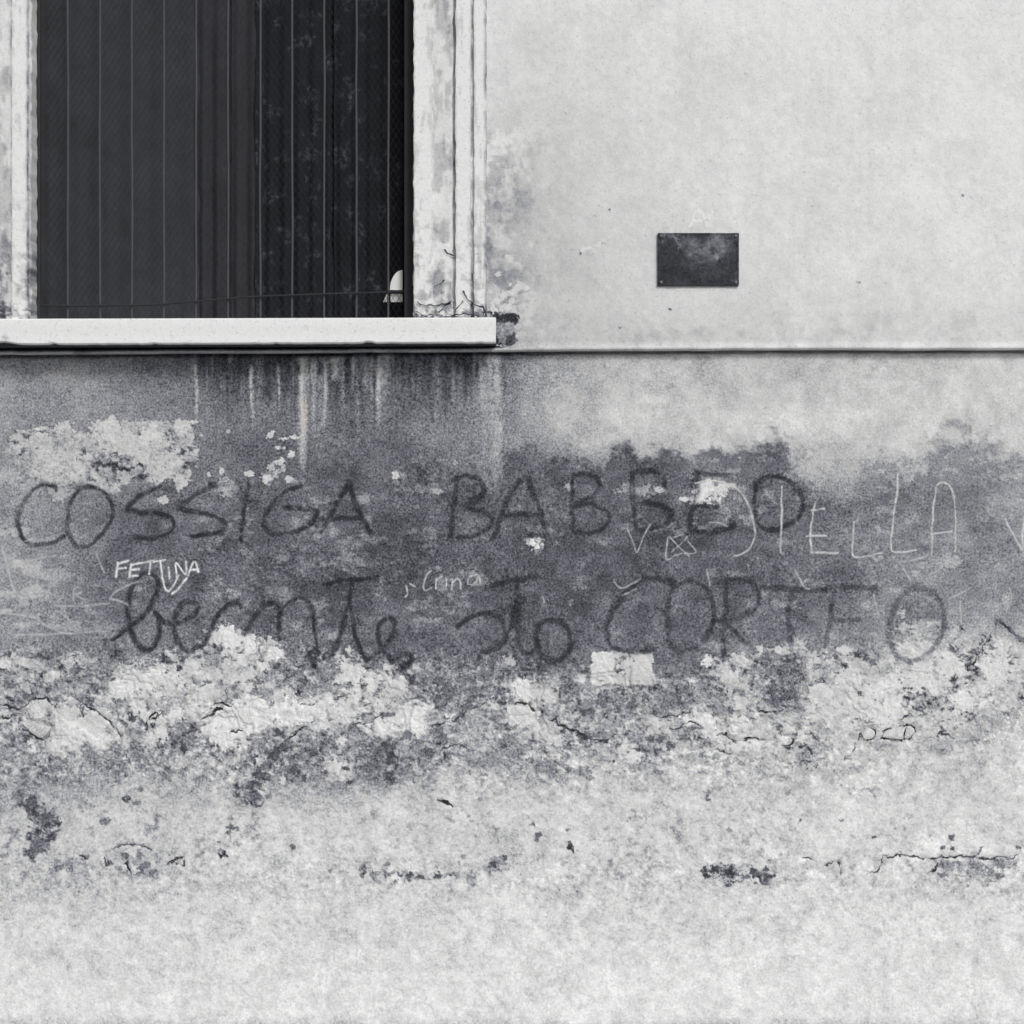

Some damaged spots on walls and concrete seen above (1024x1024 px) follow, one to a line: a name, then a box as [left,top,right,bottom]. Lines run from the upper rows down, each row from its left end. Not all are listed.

flaking render [487,254,535,347]
flaking render [0,413,301,504]
leakage [0,352,1024,678]
spalling [0,603,1024,868]
spalling [355,860,462,890]
spalling [479,849,515,880]
spalling [695,859,782,893]
crack [801,853,1020,876]